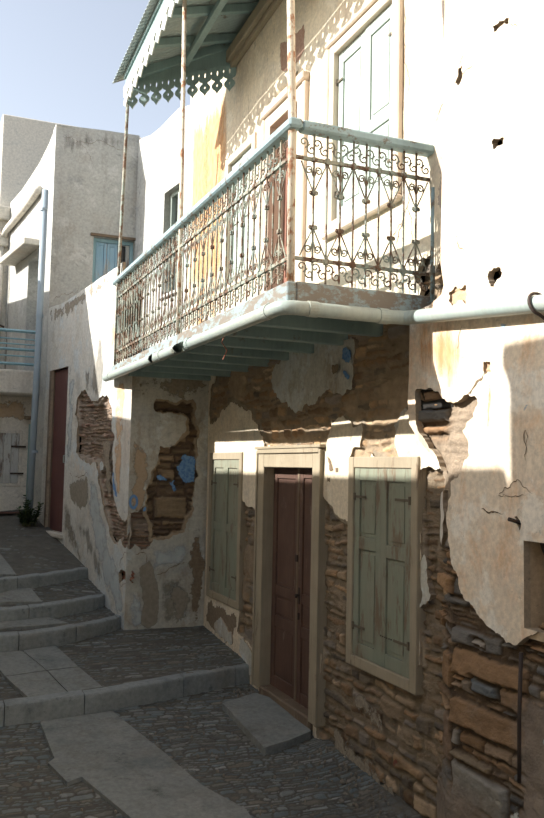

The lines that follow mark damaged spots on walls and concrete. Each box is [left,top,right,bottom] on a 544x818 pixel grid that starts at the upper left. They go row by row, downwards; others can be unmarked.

peeling [425,0,445,24]
rust [192,104,226,207]
rust [192,199,222,324]
spalling [487,267,502,287]
spalling [67,380,200,550]
crack [482,479,526,514]
water stain [140,561,159,628]
water stain [170,537,206,622]
spalling [206,324,544,818]